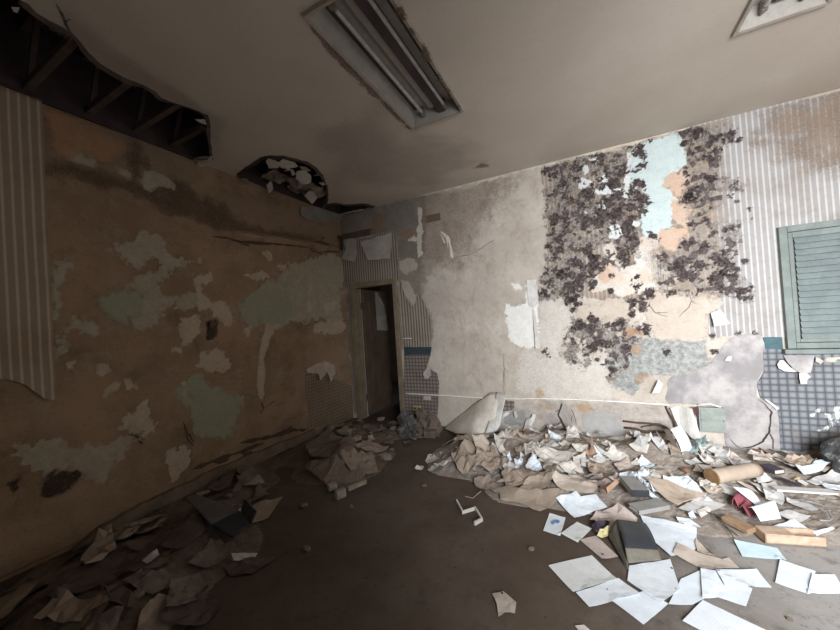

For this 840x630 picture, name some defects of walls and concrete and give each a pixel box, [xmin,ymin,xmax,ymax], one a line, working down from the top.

peeling [266,159,342,222]
crack [212,236,338,254]
peeling [399,207,424,307]
peeling [563,127,725,342]
peeling [98,230,253,374]
peeling [504,279,540,349]
spalling [256,323,281,399]
spalling [118,399,158,441]
crack [729,400,774,449]
peeling [810,406,840,432]
spalling [165,444,191,484]